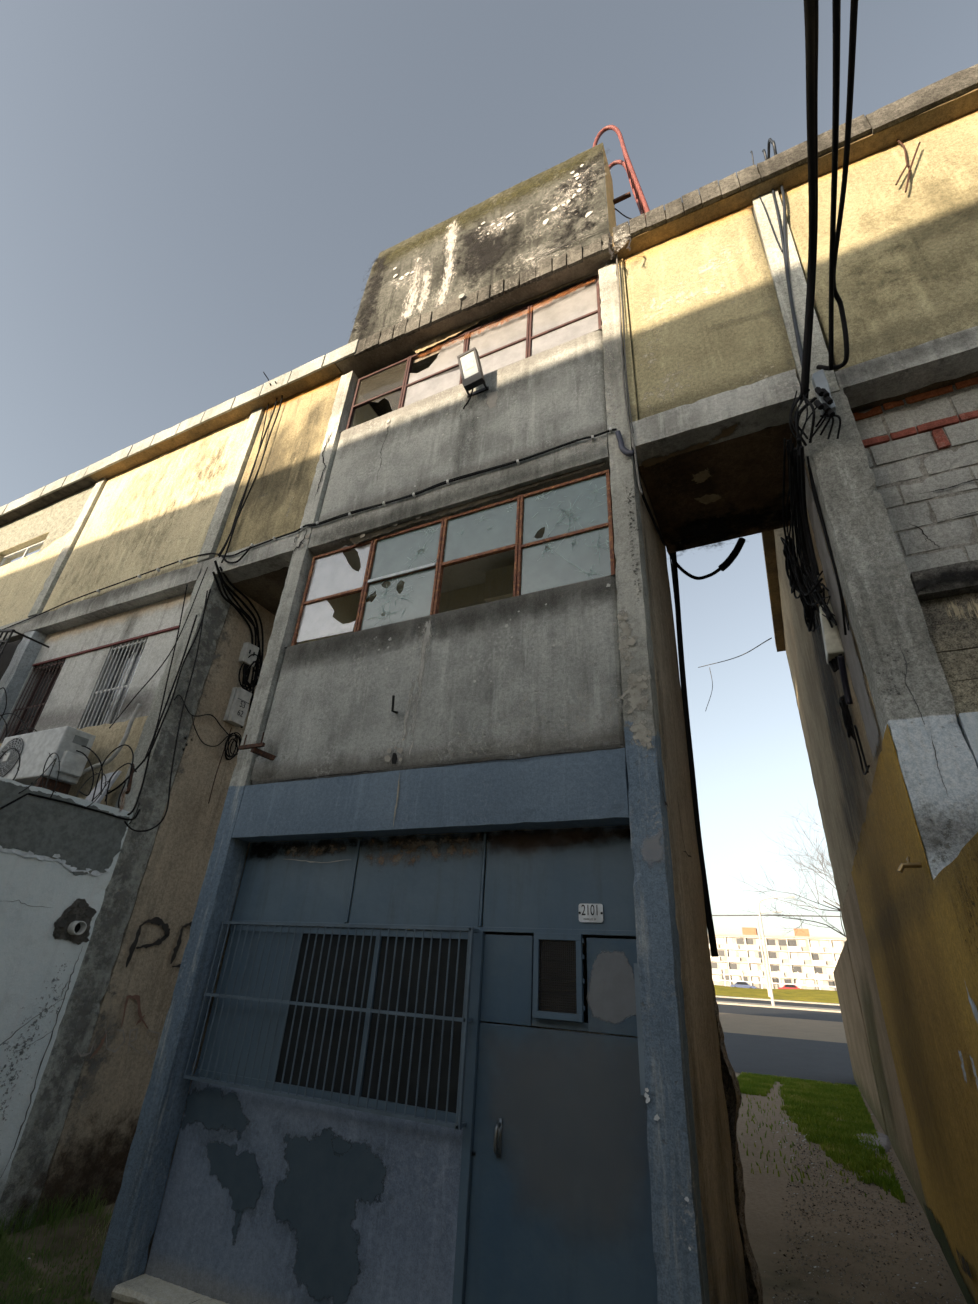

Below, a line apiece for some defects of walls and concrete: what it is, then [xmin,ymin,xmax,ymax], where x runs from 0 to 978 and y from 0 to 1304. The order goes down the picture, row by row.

leakage [353,253,392,340]
leakage [401,218,534,318]
peeling [0,780,130,876]
corrosion [492,829,621,851]
spalling [53,898,97,945]
leakage [0,589,229,1230]
crack [0,946,83,1177]